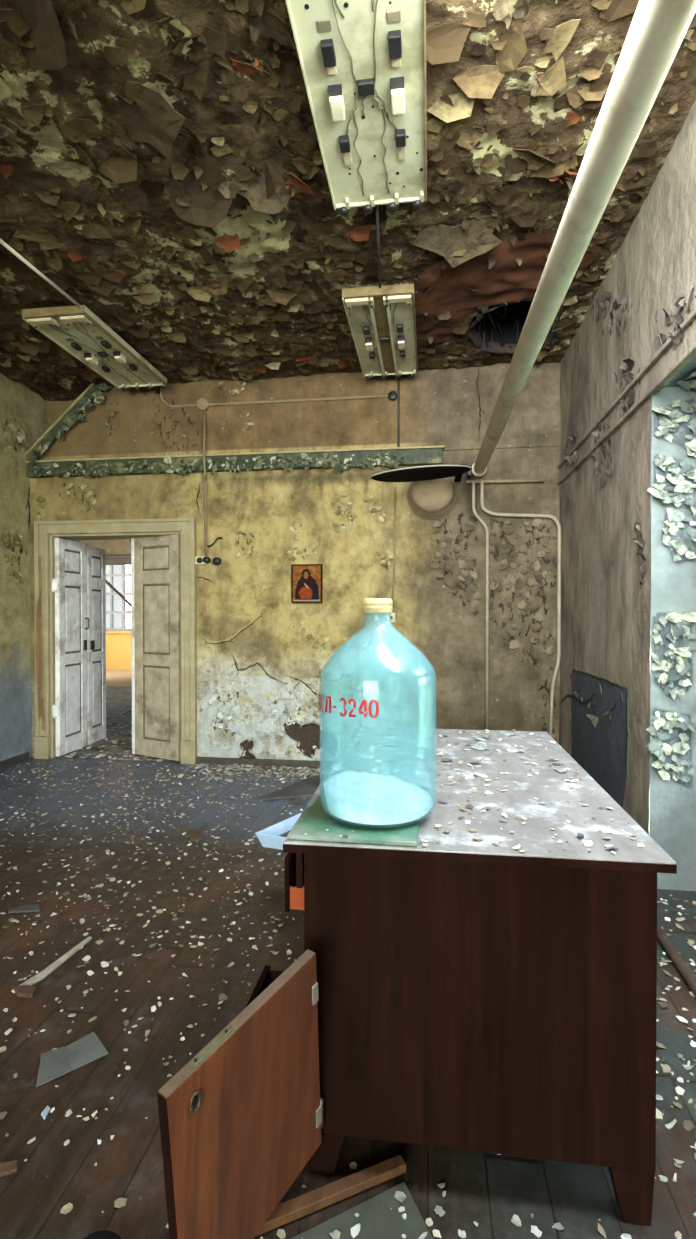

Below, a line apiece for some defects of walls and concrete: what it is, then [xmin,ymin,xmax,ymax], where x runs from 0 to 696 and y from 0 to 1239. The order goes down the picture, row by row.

peeling [683,12,696,51]
peeling [536,70,687,362]
peeling [0,0,641,519]
peeling [655,284,696,350]
crack [203,609,266,647]
peeling [209,692,256,759]
spalling [231,621,366,758]
crack [286,675,345,698]
peeling [646,612,696,788]